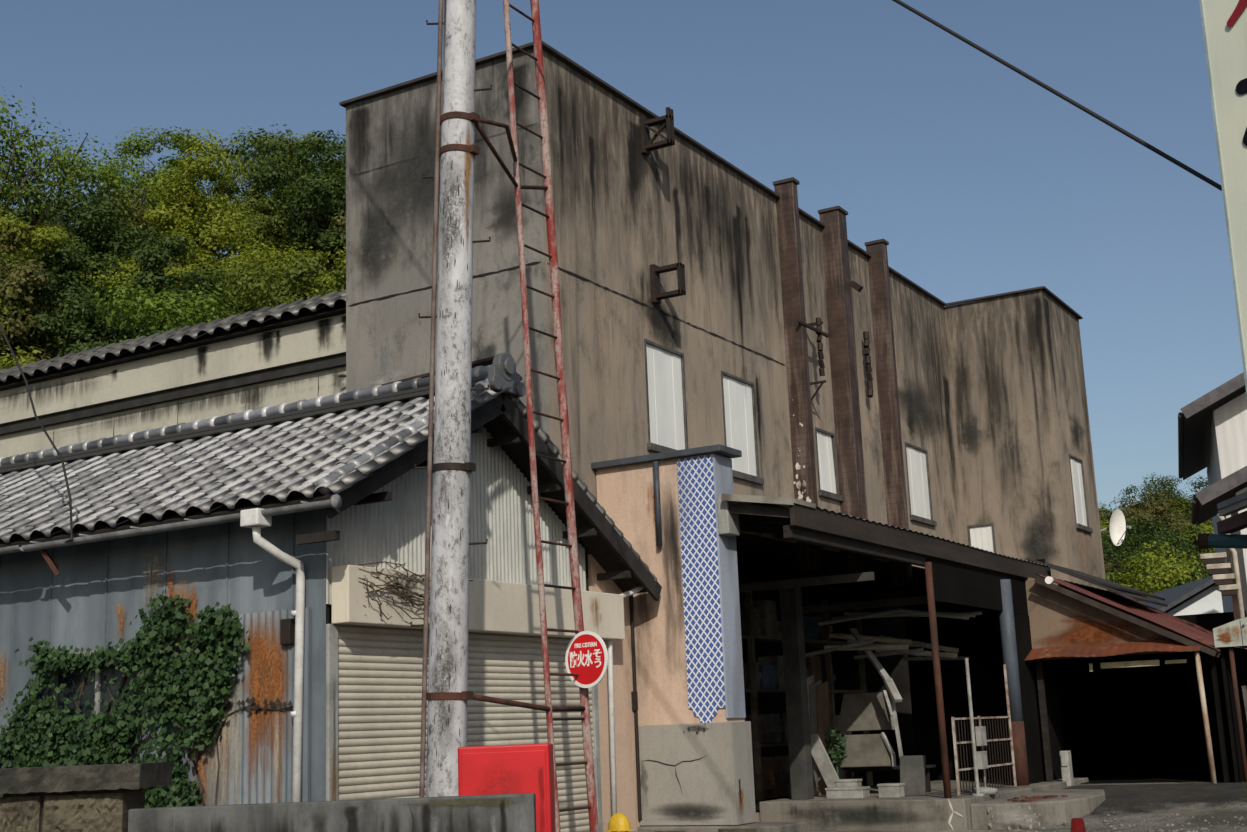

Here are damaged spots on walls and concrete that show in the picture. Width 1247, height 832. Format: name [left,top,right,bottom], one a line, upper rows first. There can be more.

water stain [508,65,526,122]
water stain [628,122,658,190]
water stain [362,115,441,274]
water stain [673,172,750,331]
water stain [318,316,346,341]
water stain [1016,298,1053,418]
water stain [898,339,1007,494]
rust [167,574,197,637]
rust [1047,619,1130,645]
rust [1218,627,1239,642]
rust [248,629,284,770]
crack [645,755,707,792]